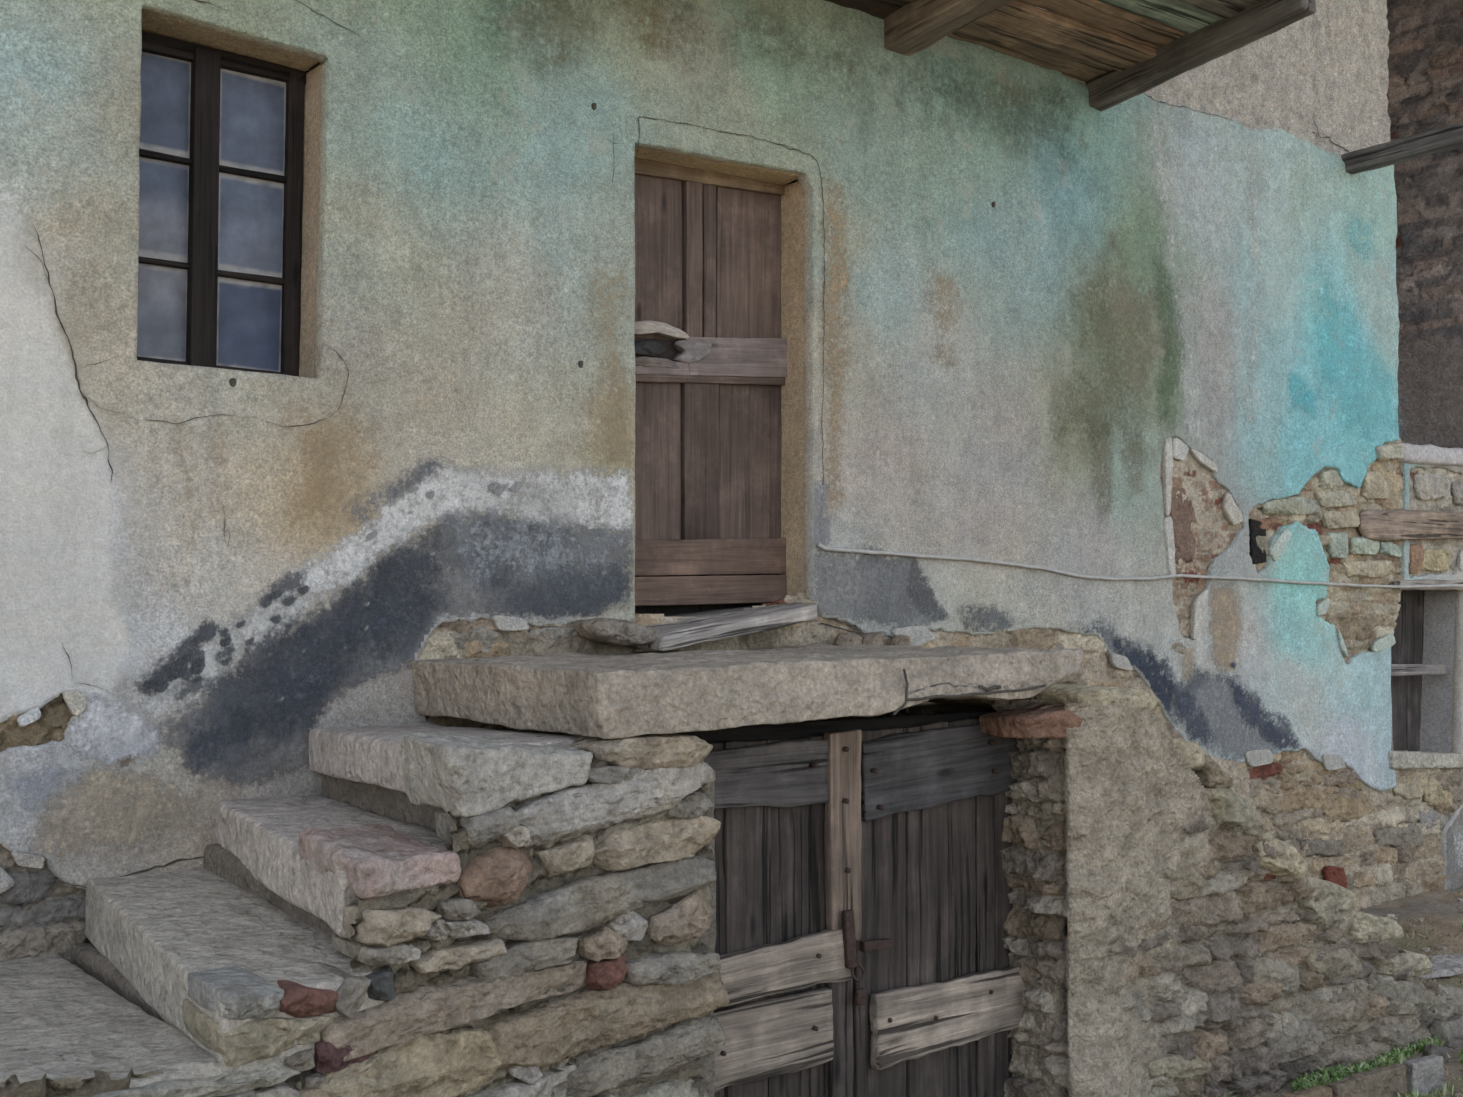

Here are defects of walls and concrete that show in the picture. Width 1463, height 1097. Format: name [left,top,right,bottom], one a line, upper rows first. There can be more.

crack [25,227,349,479]
water stain [1061,121,1201,507]
water stain [352,461,441,520]
peeling [0,460,654,767]
flaking render [634,614,692,626]
flaking render [673,437,1463,741]
water stain [1210,583,1241,671]
flaking render [0,844,91,963]
flaking render [1211,740,1463,911]